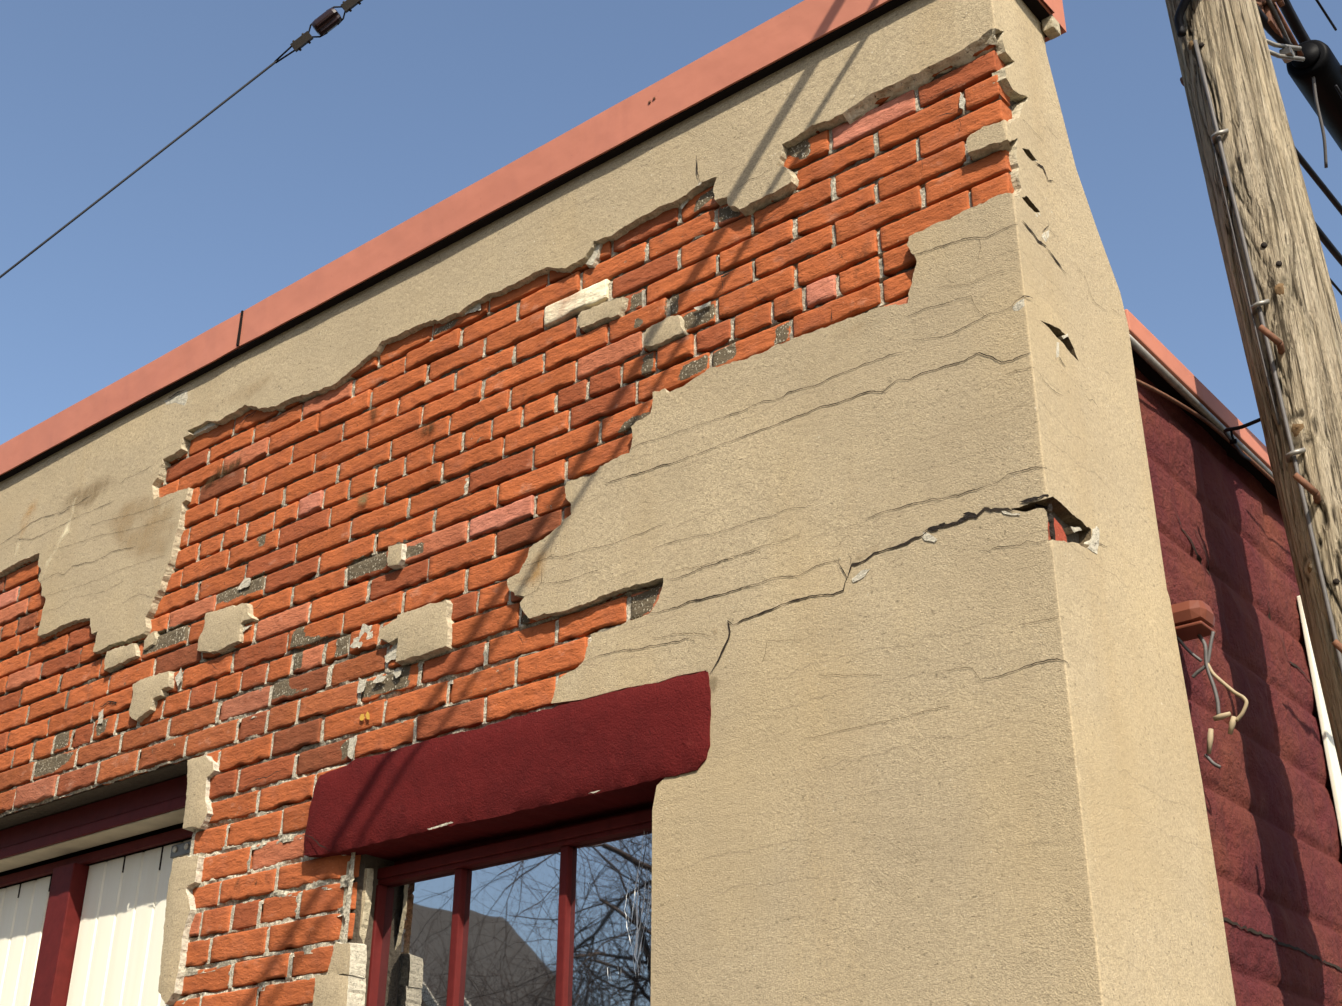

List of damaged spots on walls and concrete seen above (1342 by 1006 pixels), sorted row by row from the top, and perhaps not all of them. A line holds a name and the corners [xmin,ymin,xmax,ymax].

crack [608,221,1120,483]
crack [0,465,174,611]
flaking render [0,28,1014,1006]
crack [524,466,1049,672]
crack [948,658,1069,679]